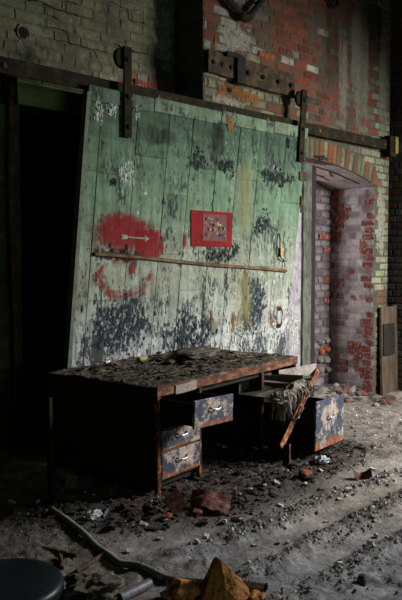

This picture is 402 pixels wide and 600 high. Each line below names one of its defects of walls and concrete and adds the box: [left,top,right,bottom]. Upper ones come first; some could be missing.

crack [28,0,147,60]
peeling [93,97,119,124]
spalling [319,189,351,253]
spalling [361,179,385,267]
peeling [87,275,279,364]
peeling [287,306,300,352]
spalling [337,312,372,392]